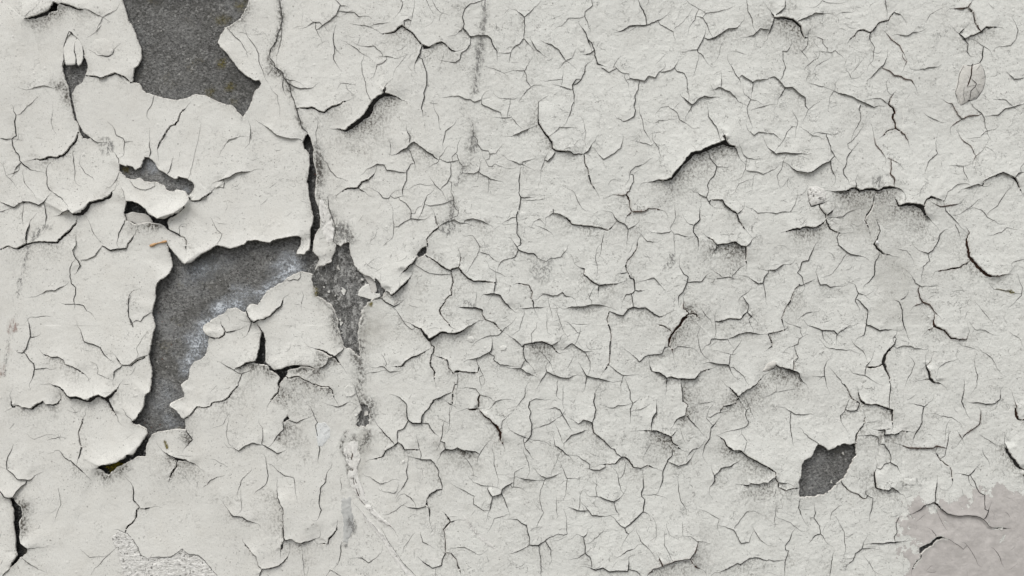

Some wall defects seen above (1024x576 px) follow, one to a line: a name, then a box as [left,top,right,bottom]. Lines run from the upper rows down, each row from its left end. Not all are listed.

crack [24,3,132,83]
peeling [123,0,261,116]
peeling [120,157,194,230]
crack [189,159,267,202]
crack [0,85,201,516]
peeling [97,236,398,475]
crack [209,0,1024,576]
crack [117,477,216,574]
crack [156,360,331,524]
peeling [798,444,856,497]